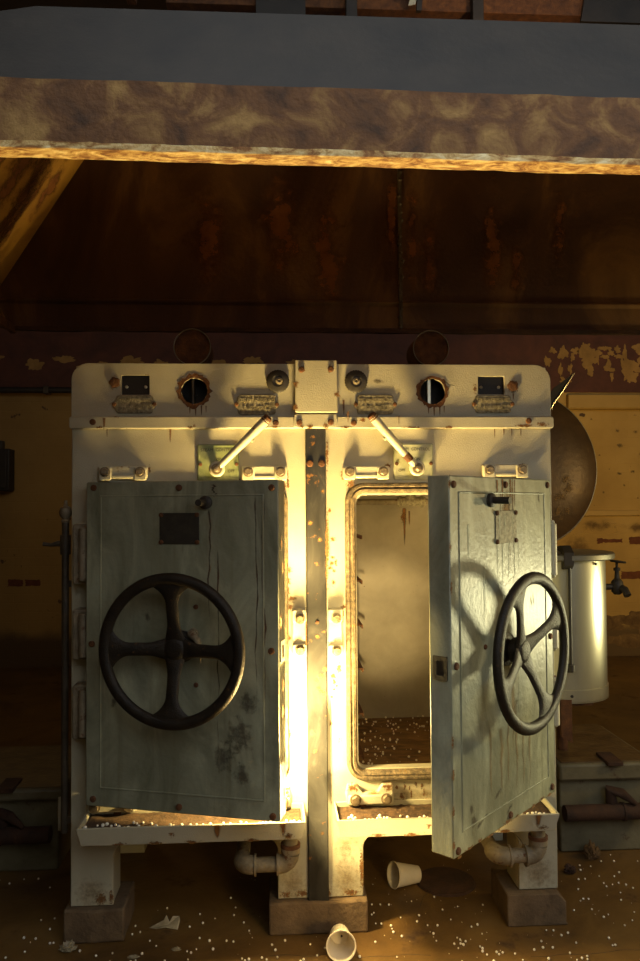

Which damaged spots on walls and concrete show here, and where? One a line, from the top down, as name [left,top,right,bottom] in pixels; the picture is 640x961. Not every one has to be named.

peeling [544,342,640,383]